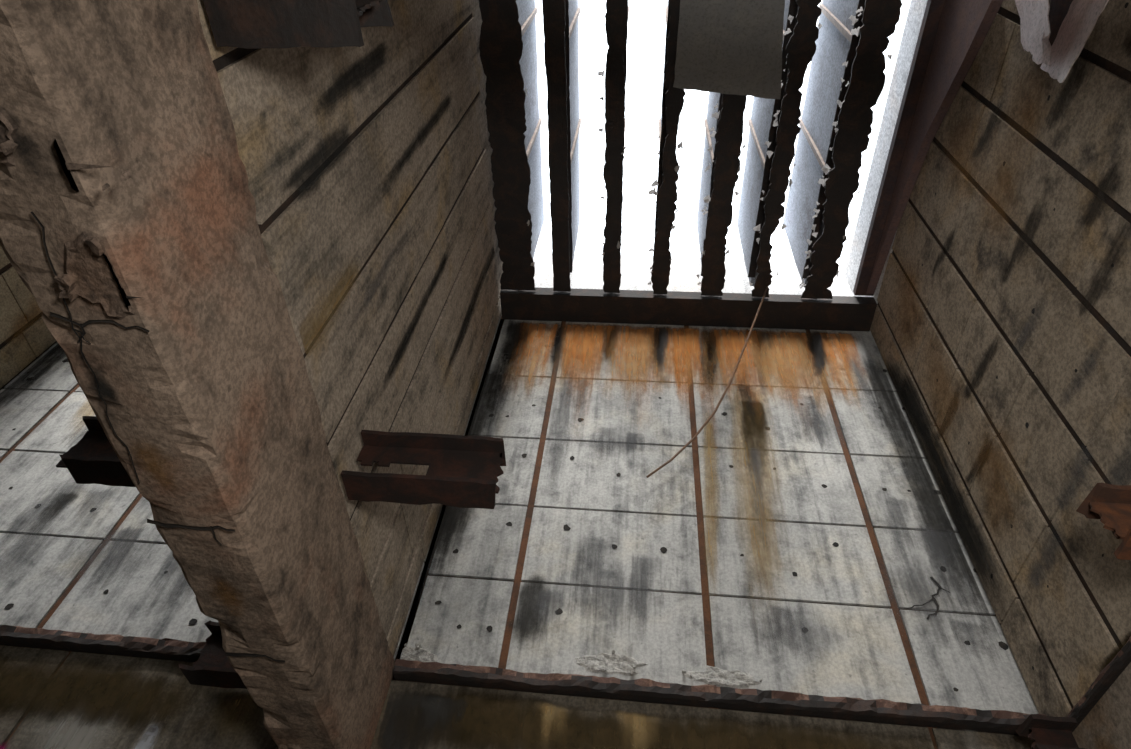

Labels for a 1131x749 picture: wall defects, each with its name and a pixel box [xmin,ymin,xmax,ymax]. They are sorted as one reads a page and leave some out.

leakage [1047,53,1086,128]
leakage [1084,164,1118,227]
leakage [933,230,955,275]
leakage [1000,207,1043,281]
leakage [1081,226,1131,315]
crack [31,211,150,484]
corrosion [509,322,857,575]
leakage [16,485,101,557]
leakage [86,529,140,567]
leakage [513,575,551,641]